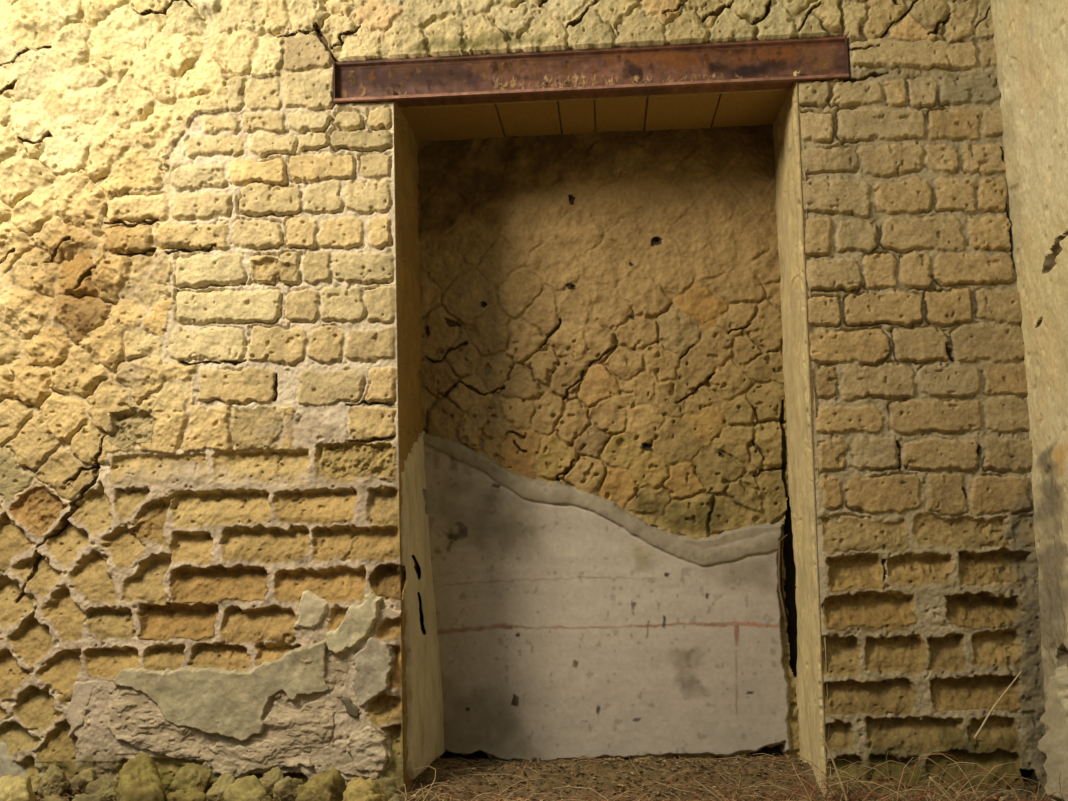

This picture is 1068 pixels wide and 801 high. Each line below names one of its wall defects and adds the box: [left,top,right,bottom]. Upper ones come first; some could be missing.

crack [133,0,192,16]
crack [0,46,52,95]
crack [277,22,361,62]
crack [846,0,918,82]
crack [17,132,53,144]
crack [41,236,71,264]
crack [73,219,217,289]
crack [1042,231,1068,273]
crack [563,344,616,401]
crack [16,435,107,603]
crack [752,400,797,677]
flaking render [107,564,408,780]